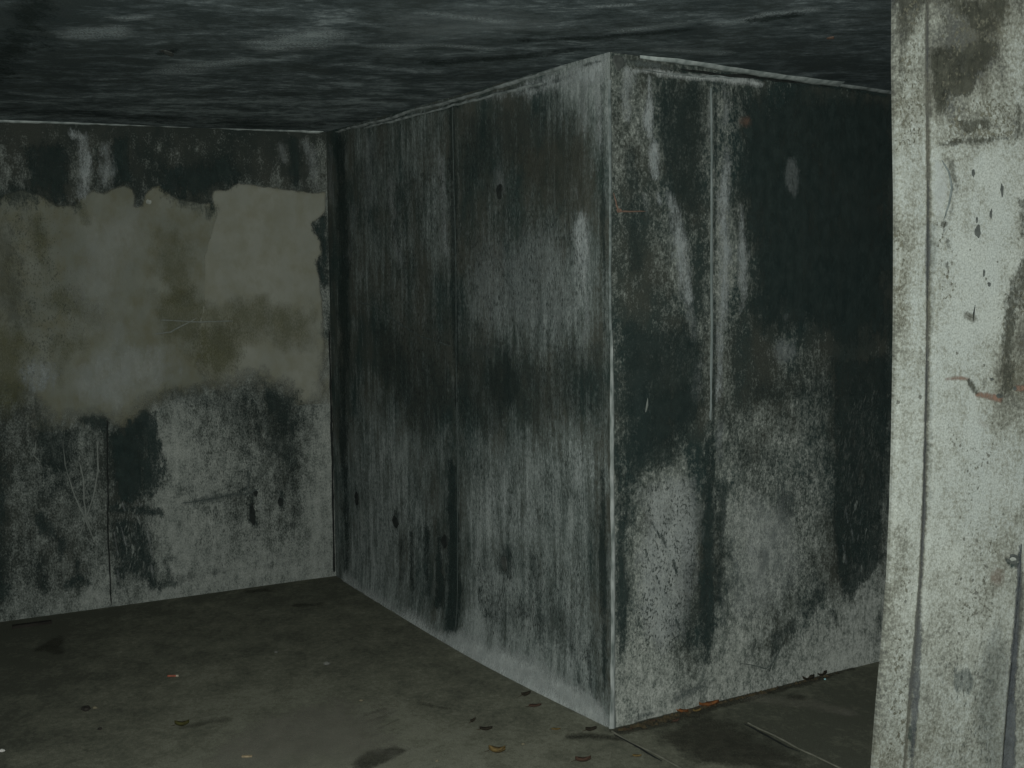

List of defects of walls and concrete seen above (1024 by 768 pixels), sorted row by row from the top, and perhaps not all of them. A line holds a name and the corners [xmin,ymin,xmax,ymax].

damp [0,130,132,207]
damp [643,80,704,304]
damp [716,0,1010,399]
damp [79,410,166,517]
damp [312,129,855,768]
rust [951,377,1024,402]